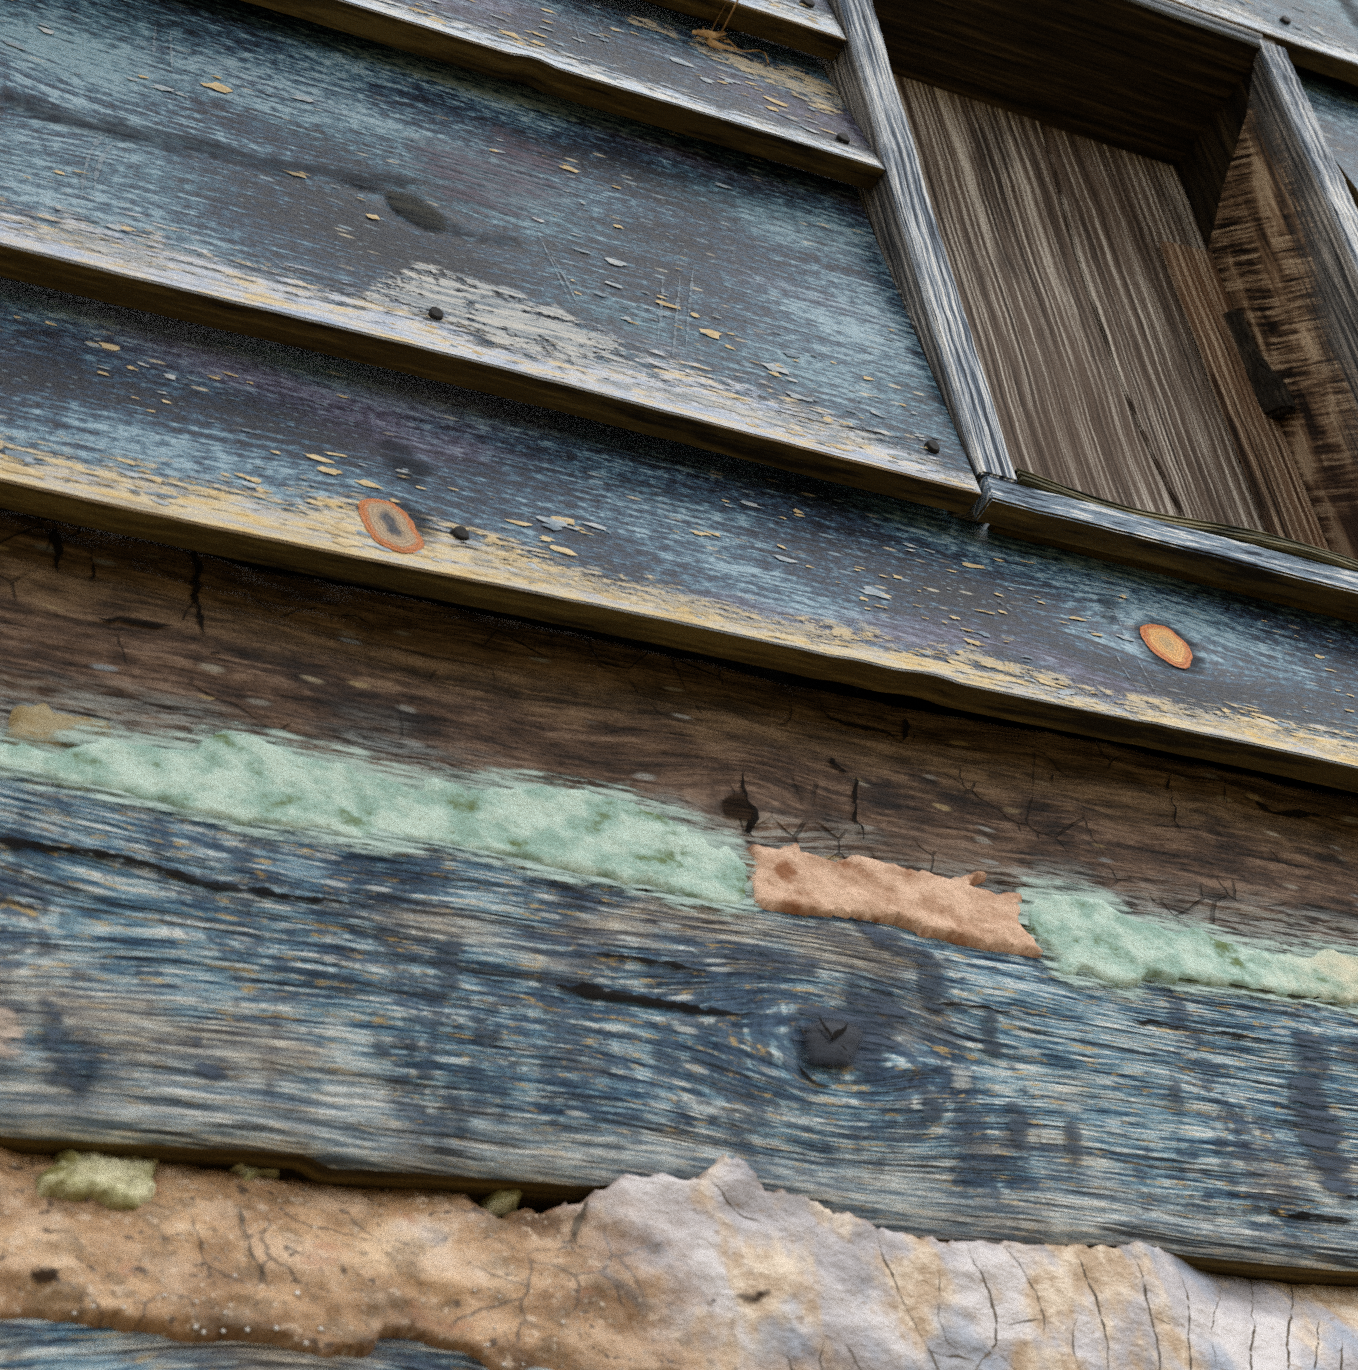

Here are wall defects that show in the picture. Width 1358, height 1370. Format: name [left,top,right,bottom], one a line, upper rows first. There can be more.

peeling [127,75,188,97]
peeling [201,75,233,93]
peeling [0,170,976,490]
crack [50,527,95,582]
crack [96,550,221,654]
peeling [0,432,1358,766]
crack [572,1196,589,1244]
crack [711,1180,763,1222]
crack [1268,1195,1358,1223]
crack [878,1238,1109,1370]
crack [1137,1262,1343,1370]
crack [787,1341,861,1370]